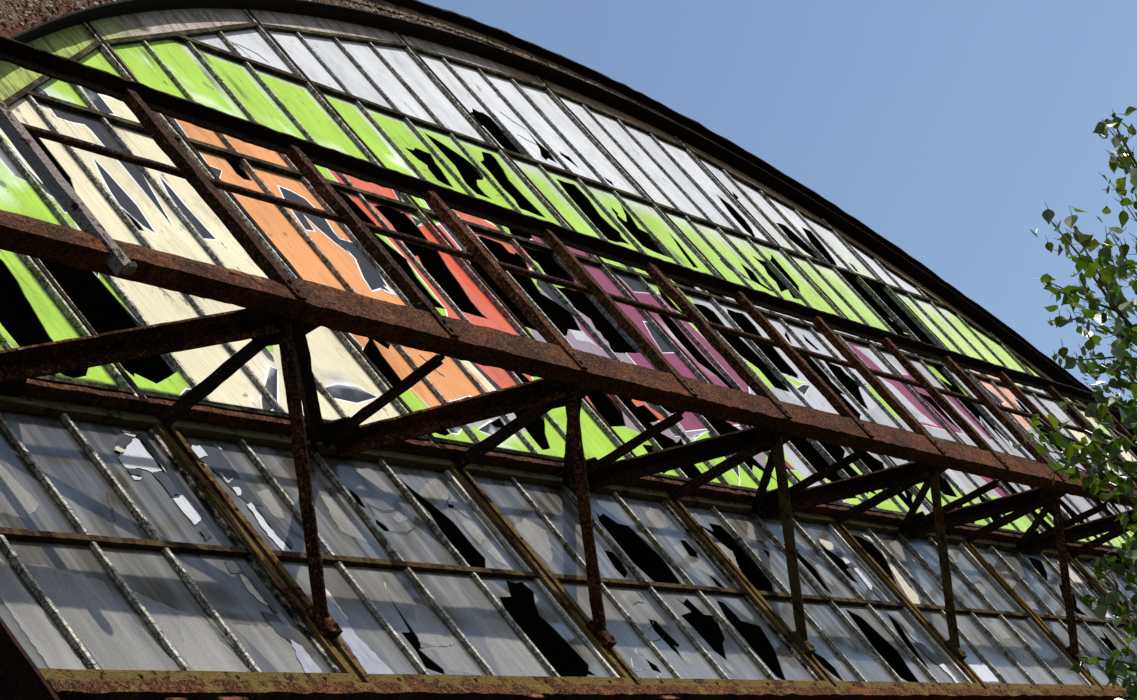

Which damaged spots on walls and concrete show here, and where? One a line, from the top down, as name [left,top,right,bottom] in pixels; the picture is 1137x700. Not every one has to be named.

peeling [115,430,212,540]
peeling [192,445,293,551]
peeling [224,560,322,673]